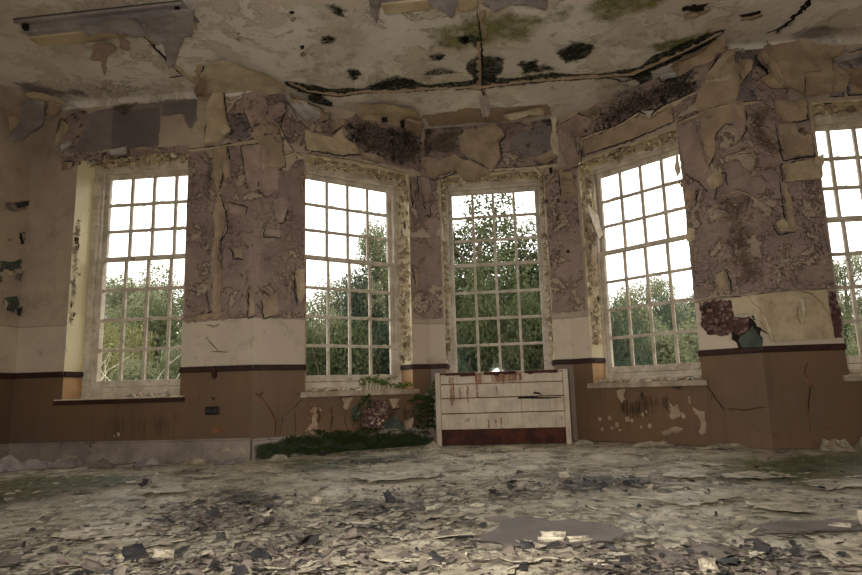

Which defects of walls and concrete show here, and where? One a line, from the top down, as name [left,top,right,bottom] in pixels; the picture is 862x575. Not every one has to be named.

crack [767,0,811,34]
crack [188,9,722,176]
leakage [285,29,725,123]
crack [755,57,820,98]
crack [579,91,762,150]
peeling [16,38,862,363]
peeling [0,259,25,284]
peeling [3,296,23,317]
peeling [305,403,322,435]
spalling [339,396,414,437]
peeling [661,396,707,436]
crack [706,386,766,411]